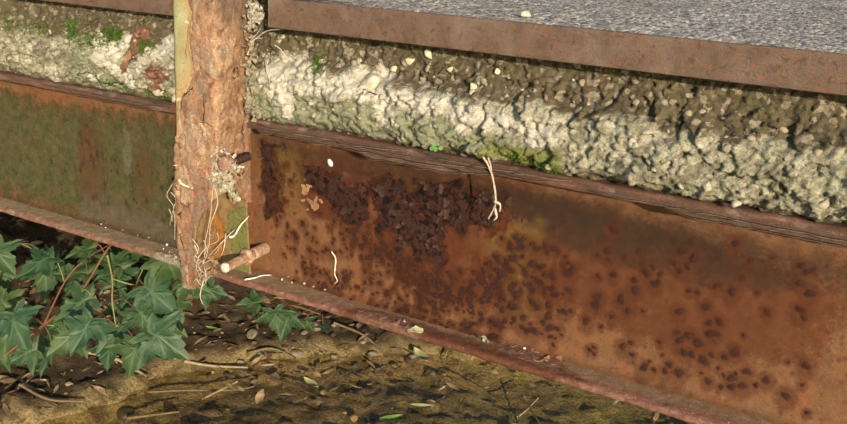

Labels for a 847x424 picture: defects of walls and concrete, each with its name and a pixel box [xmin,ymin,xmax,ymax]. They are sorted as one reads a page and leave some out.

corrosion [120,26,151,74]
corrosion [252,123,575,294]
spalling [0,0,847,296]
corrosion [585,187,847,248]